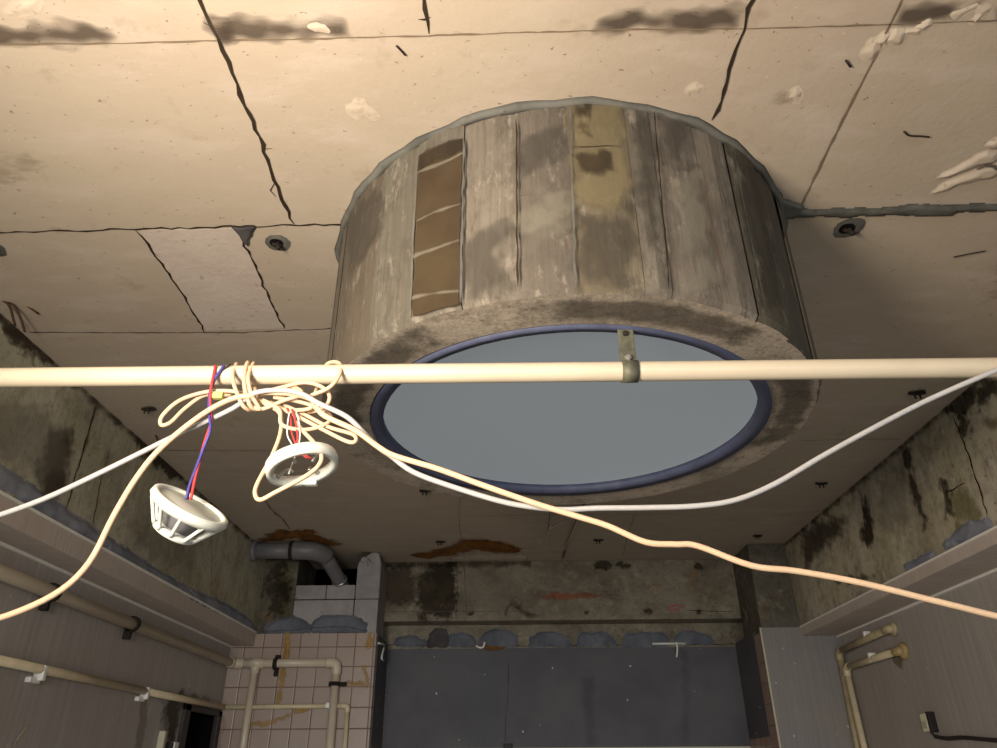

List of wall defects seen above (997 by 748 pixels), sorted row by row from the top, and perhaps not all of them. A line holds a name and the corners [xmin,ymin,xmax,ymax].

water stain [0,24,109,44]
water stain [601,10,735,31]
crack [712,0,755,120]
spalling [858,0,993,62]
crack [801,0,902,204]
crack [0,0,341,333]
spalling [881,136,997,217]
water stain [942,378,997,437]
water stain [37,431,70,495]
water stain [132,432,182,479]
rust [259,529,342,546]
rust [412,539,522,559]